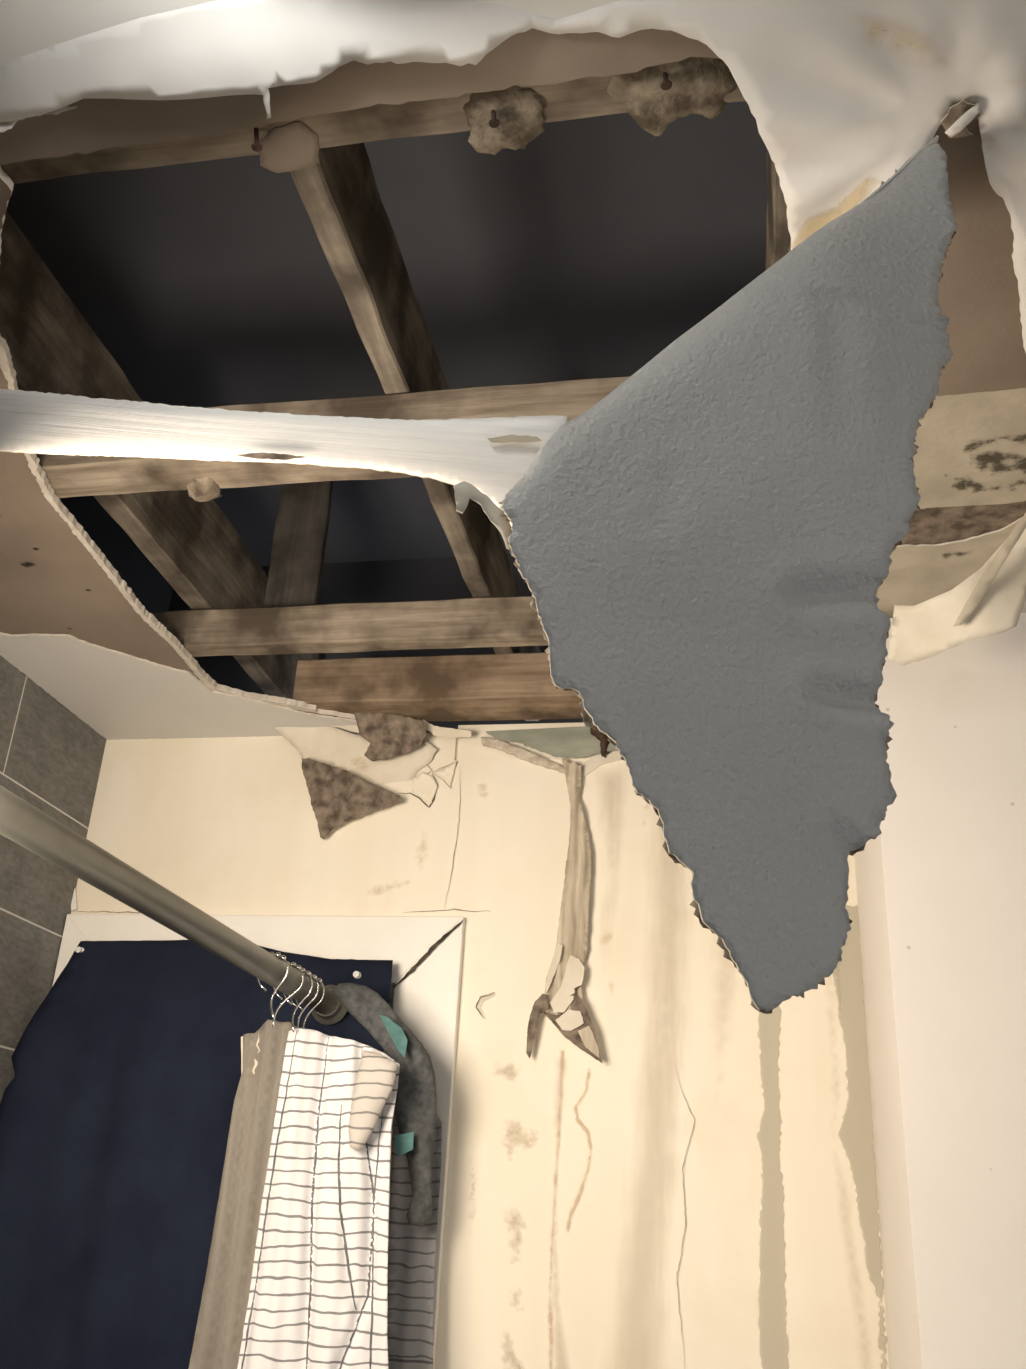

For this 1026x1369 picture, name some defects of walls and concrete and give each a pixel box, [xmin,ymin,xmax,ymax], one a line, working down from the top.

peeling [0,135,958,1063]
leakage [945,435,1026,492]
leakage [757,1006,788,1369]
leakage [833,906,887,1369]